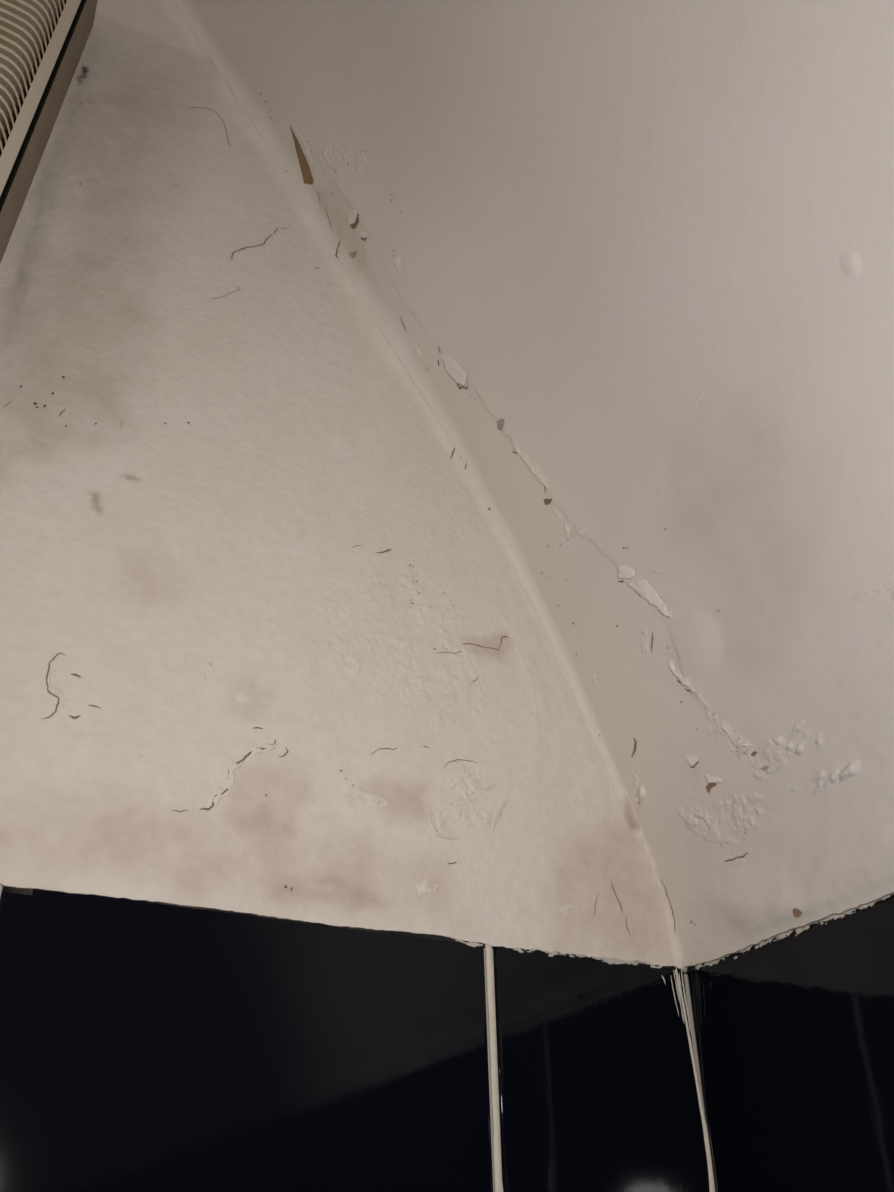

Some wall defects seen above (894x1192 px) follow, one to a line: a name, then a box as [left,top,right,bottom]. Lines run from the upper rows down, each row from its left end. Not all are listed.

crack [208,227,286,300]
flaking render [346,208,367,264]
peeling [497,419,552,505]
peeling [614,563,674,619]
peeling [685,755,722,793]